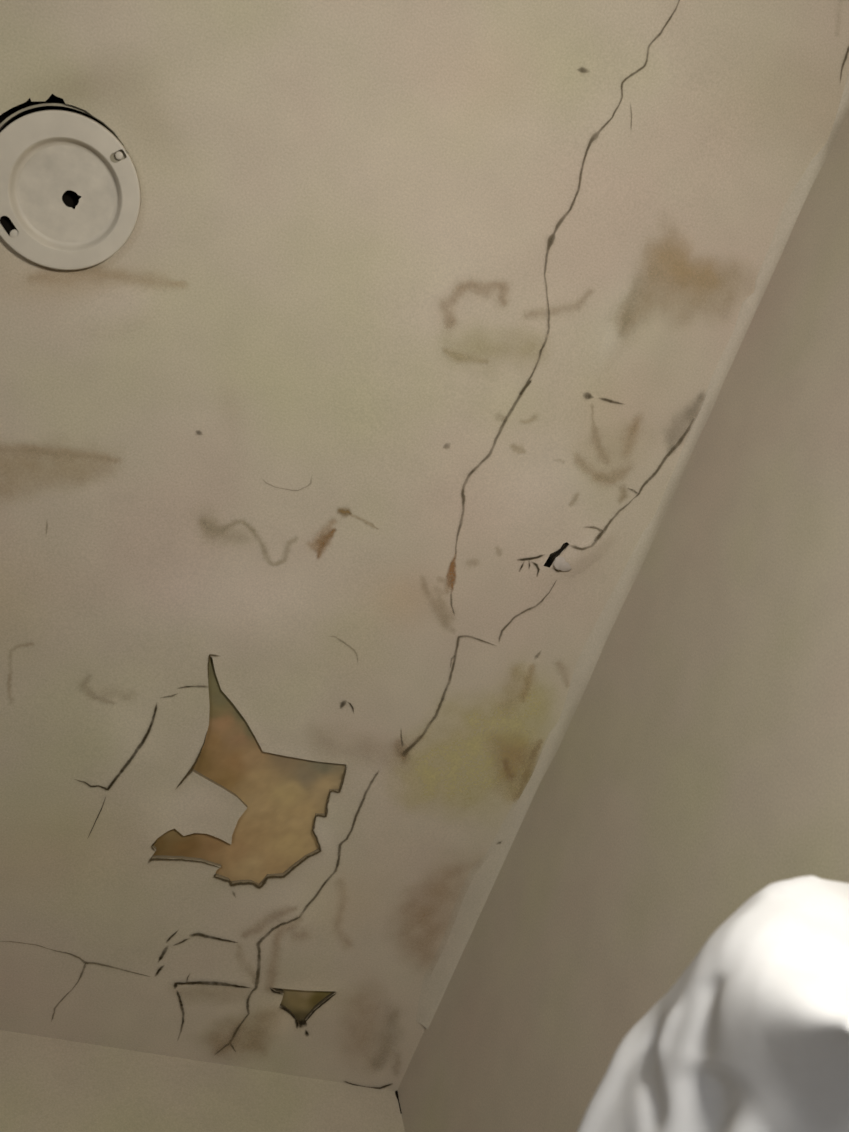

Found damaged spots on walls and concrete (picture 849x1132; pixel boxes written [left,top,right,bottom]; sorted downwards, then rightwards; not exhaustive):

crack [545,0,680,270]
crack [455,299,550,549]
crack [574,426,690,550]
crack [78,686,204,837]
peeling [148,654,347,889]
crack [401,582,556,754]
crack [10,774,377,1053]
peeling [271,987,335,1035]